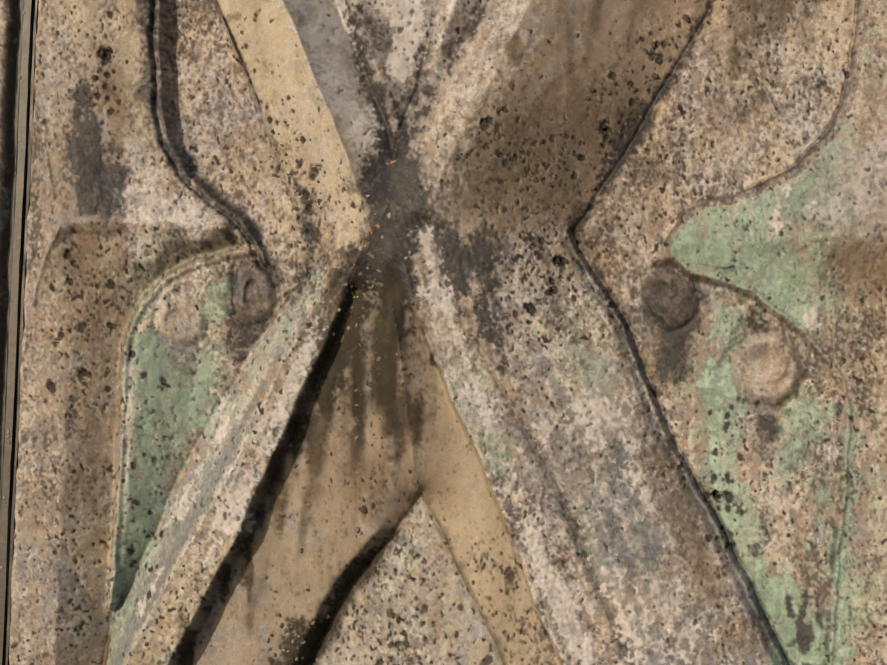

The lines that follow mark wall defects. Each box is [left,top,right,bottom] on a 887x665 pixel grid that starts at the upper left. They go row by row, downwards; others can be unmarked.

water stain [573,5,712,235]
water stain [216,0,512,603]
water stain [268,529,400,665]